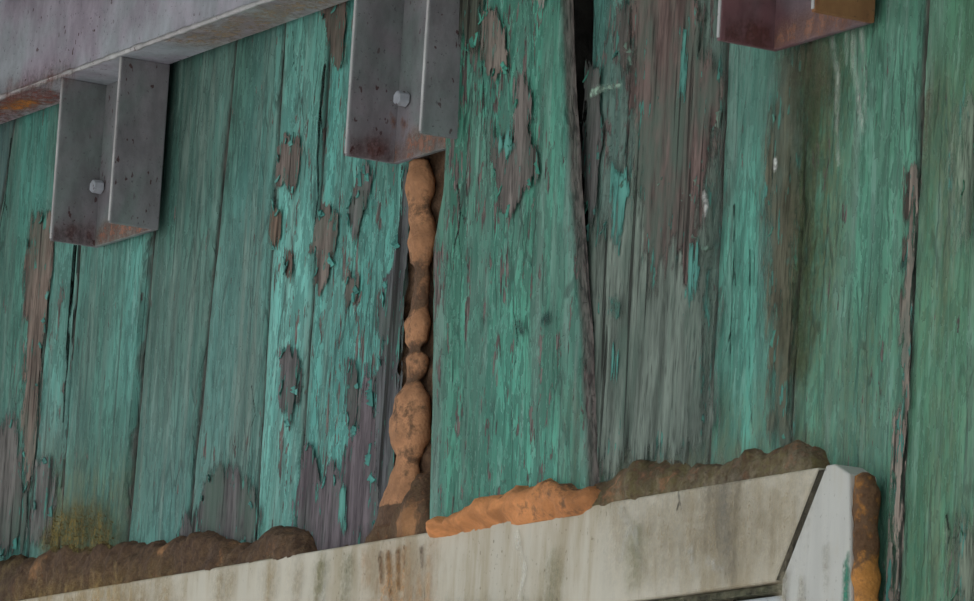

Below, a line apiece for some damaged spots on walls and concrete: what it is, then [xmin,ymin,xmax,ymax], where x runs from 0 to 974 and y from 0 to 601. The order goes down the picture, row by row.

corrosion [0,73,60,122]
peeling [458,0,540,218]
peeling [269,132,303,283]
peeling [278,341,303,427]
peeling [291,159,409,551]
peeling [176,458,262,543]
damp [378,546,405,596]